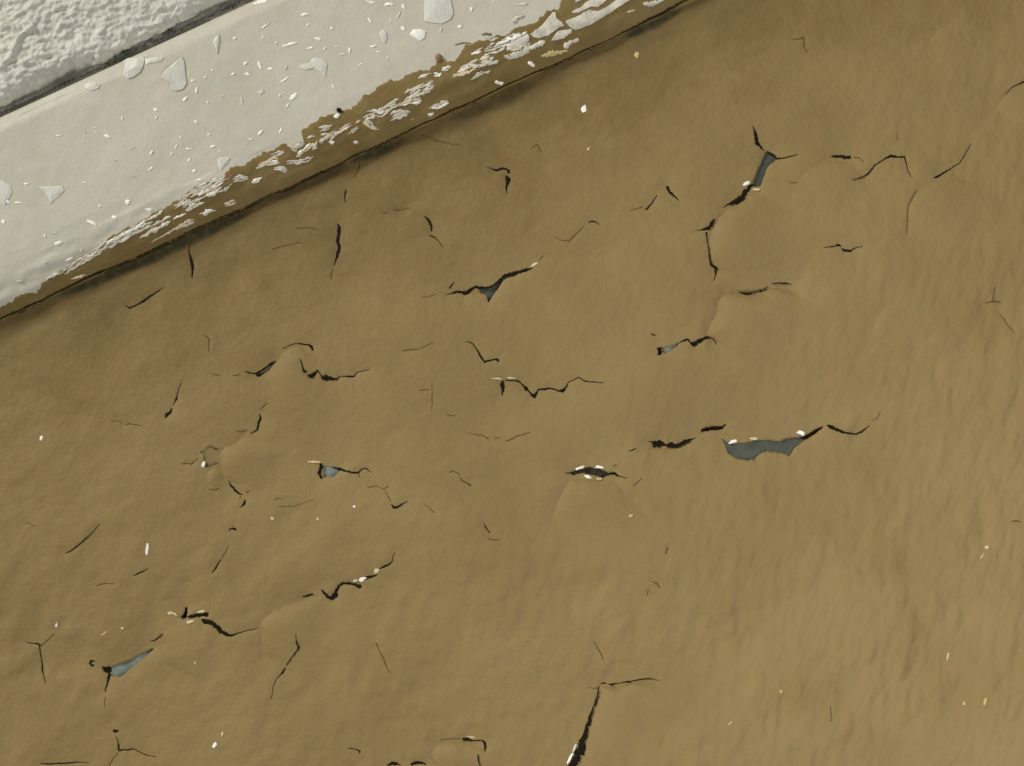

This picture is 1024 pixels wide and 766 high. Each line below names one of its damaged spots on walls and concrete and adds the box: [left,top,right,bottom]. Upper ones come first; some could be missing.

peeling [47,0,664,279]
peeling [722,126,798,208]
crack [831,132,971,232]
peeling [421,256,543,302]
crack [284,343,369,381]
crack [465,341,603,398]
crack [629,438,695,451]
peeling [701,425,822,460]
peeling [567,464,641,486]
crack [302,553,395,600]
peeling [89,634,162,704]
crack [567,641,656,766]